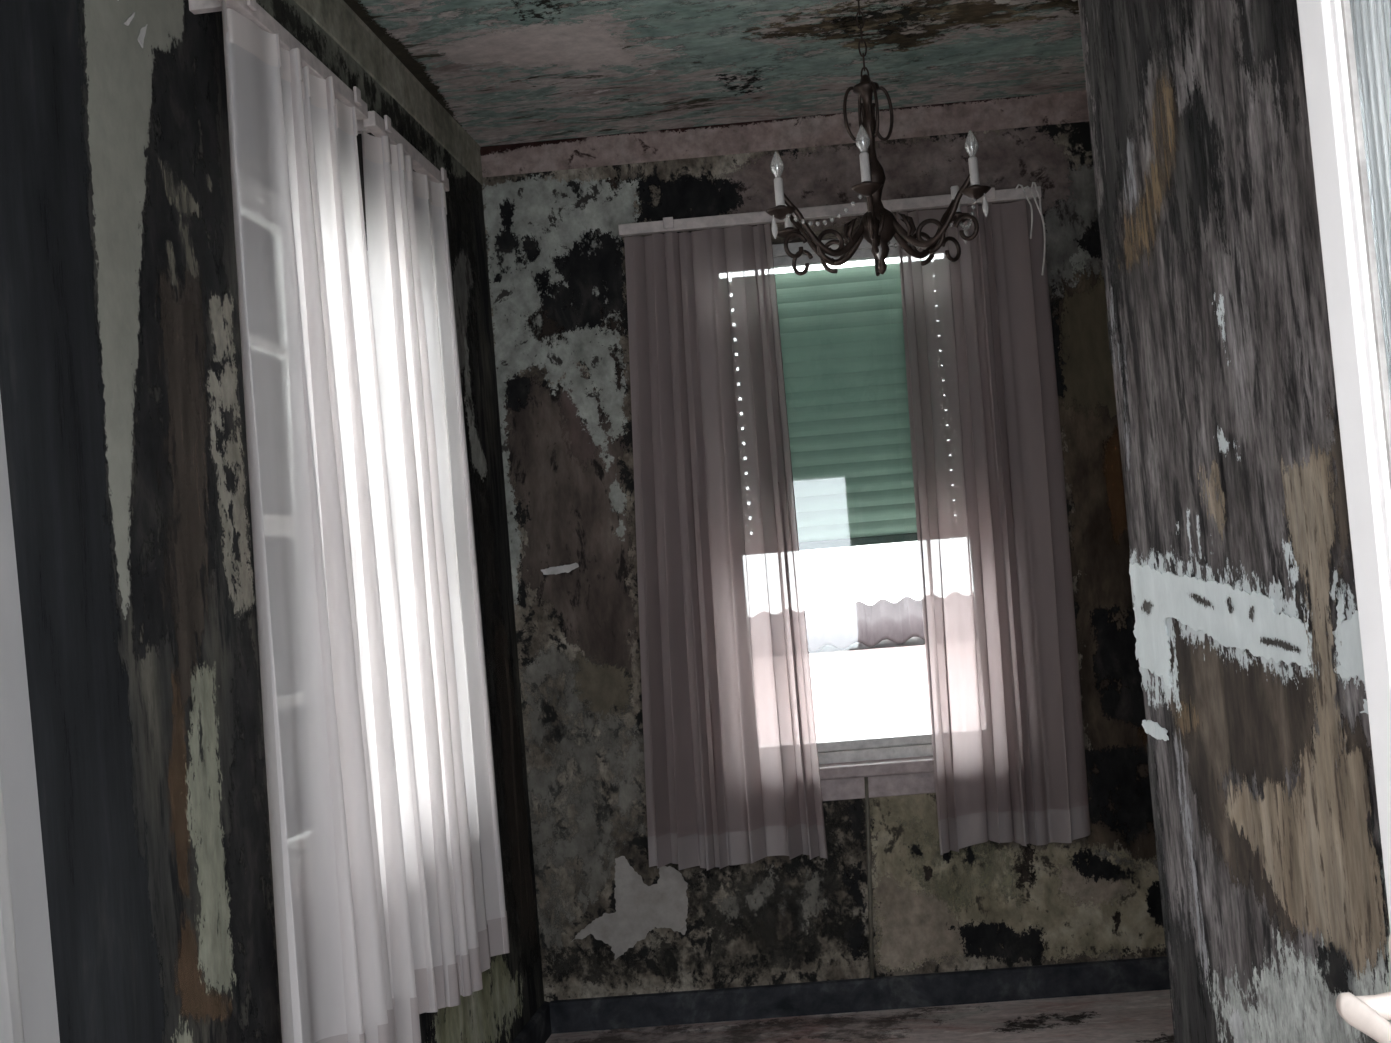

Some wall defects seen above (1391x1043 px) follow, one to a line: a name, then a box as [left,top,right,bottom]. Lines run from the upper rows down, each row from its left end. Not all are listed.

peeling [256,0,467,178]
flaking render [409,0,641,73]
peeling [82,0,185,620]
peeling [206,290,256,620]
flaking render [482,173,642,693]
leakage [742,0,1391,1043]
peeling [1129,508,1368,741]
peeling [183,659,237,999]
peeling [171,1011,193,1043]